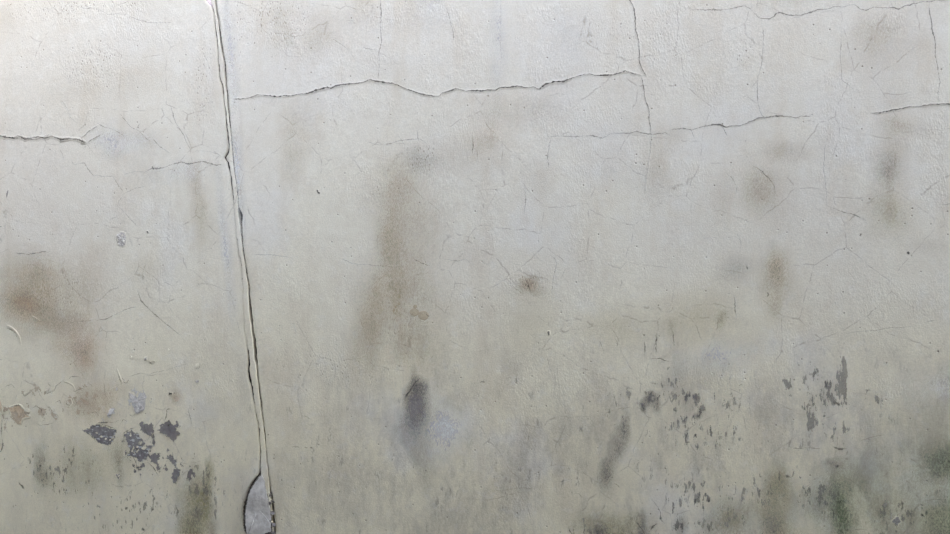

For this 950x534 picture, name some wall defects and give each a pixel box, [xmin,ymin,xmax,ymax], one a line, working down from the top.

crack [0,118,139,145]
crack [870,102,950,115]
crack [213,0,652,433]
peeling [0,369,195,483]
flaking render [243,474,276,534]